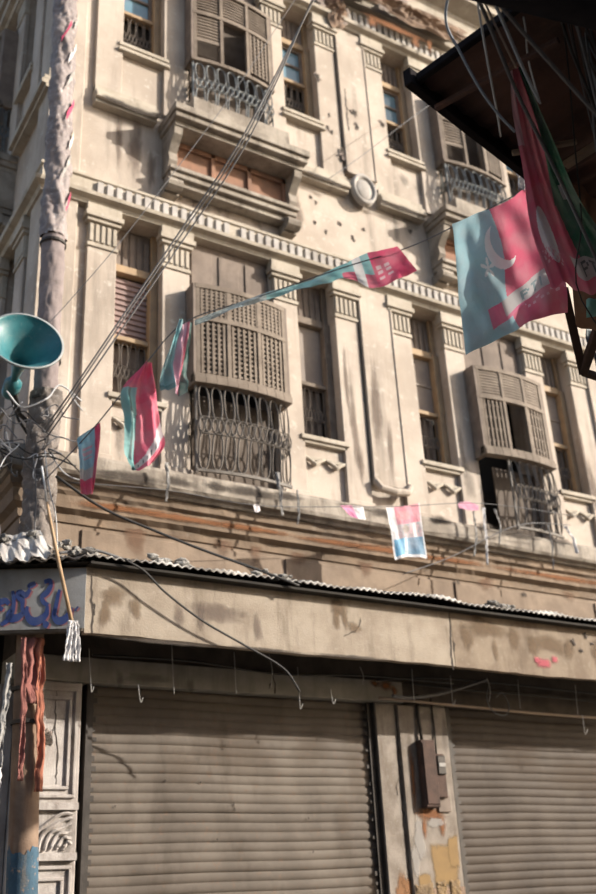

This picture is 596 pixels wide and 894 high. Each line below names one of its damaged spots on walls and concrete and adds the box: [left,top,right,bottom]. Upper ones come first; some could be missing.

water stain [117,126,140,165]
crack [88,575,96,633]
water stain [100,589,121,623]
water stain [332,601,359,630]
water stain [461,619,518,659]
water stain [529,638,572,655]
crack [51,691,59,784]
peeling [396,818,466,894]